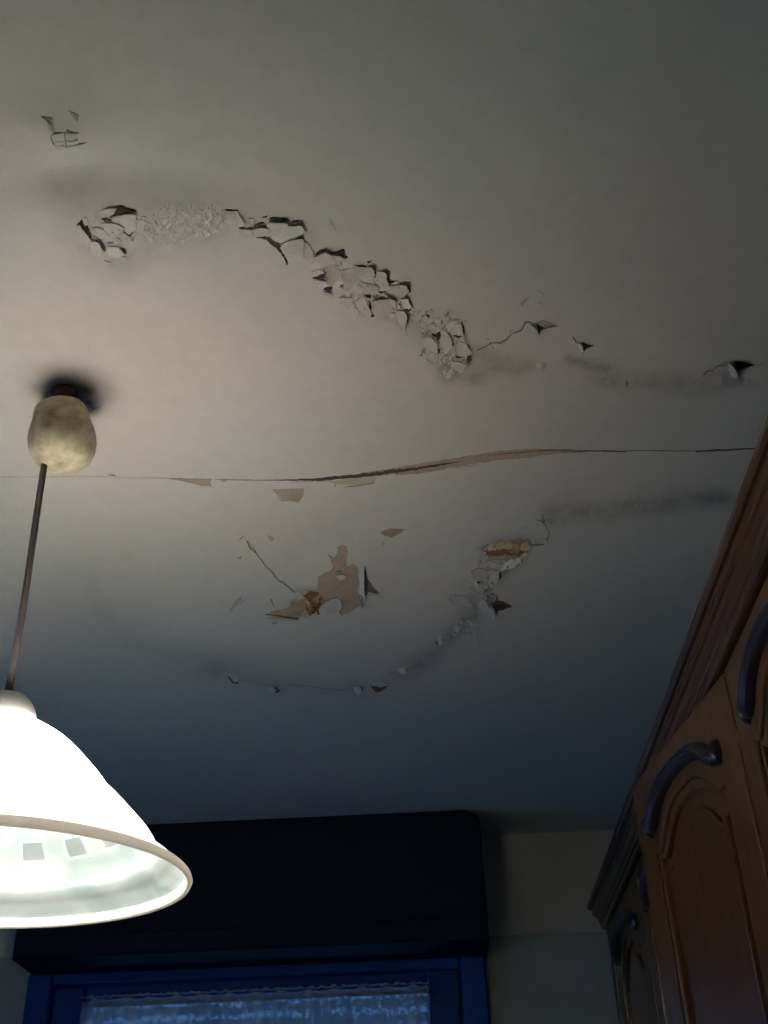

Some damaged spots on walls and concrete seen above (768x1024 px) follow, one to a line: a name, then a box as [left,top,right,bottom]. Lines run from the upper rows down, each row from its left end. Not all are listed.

peeling [74,204,145,267]
peeling [225,209,476,382]
crack [476,321,531,351]
peeling [703,360,763,386]
peeling [272,488,304,503]
crack [46,448,755,487]
crack [238,537,295,593]
peeling [265,545,382,624]
peeling [467,539,532,620]